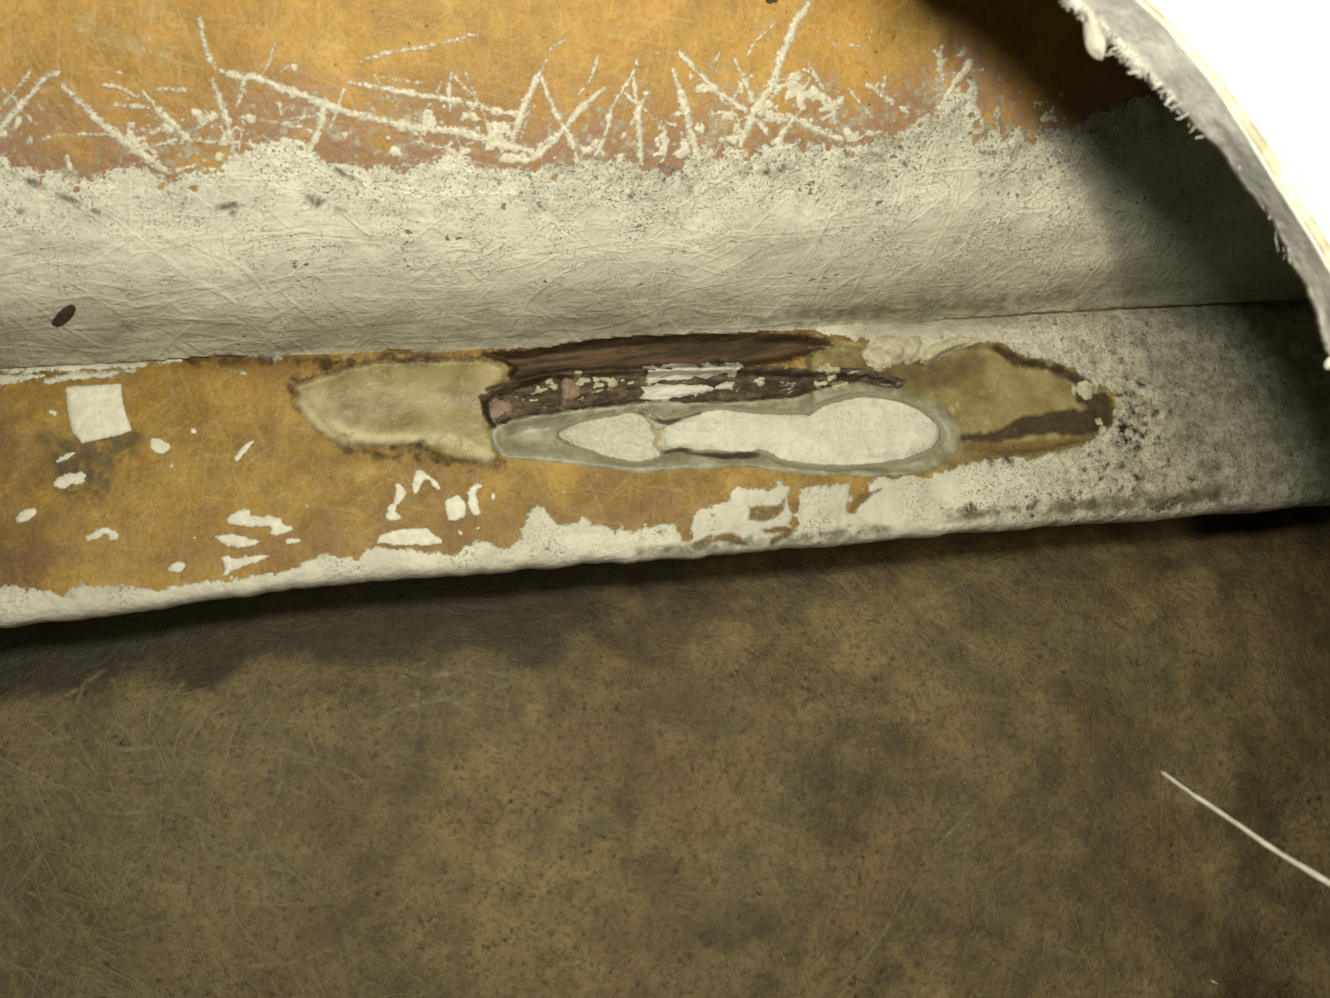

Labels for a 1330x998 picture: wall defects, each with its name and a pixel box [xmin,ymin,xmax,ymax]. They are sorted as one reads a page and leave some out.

rust [479,331,833,381]
peeling [861,334,980,371]
peeling [0,359,182,386]
peeling [1071,376,1098,406]
peeling [150,438,173,468]
peeling [234,441,254,462]
peeling [53,452,87,489]
peeling [15,508,37,523]
peeling [377,470,495,546]
peeling [85,527,119,541]
peeling [215,508,301,576]
peeling [168,562,185,573]